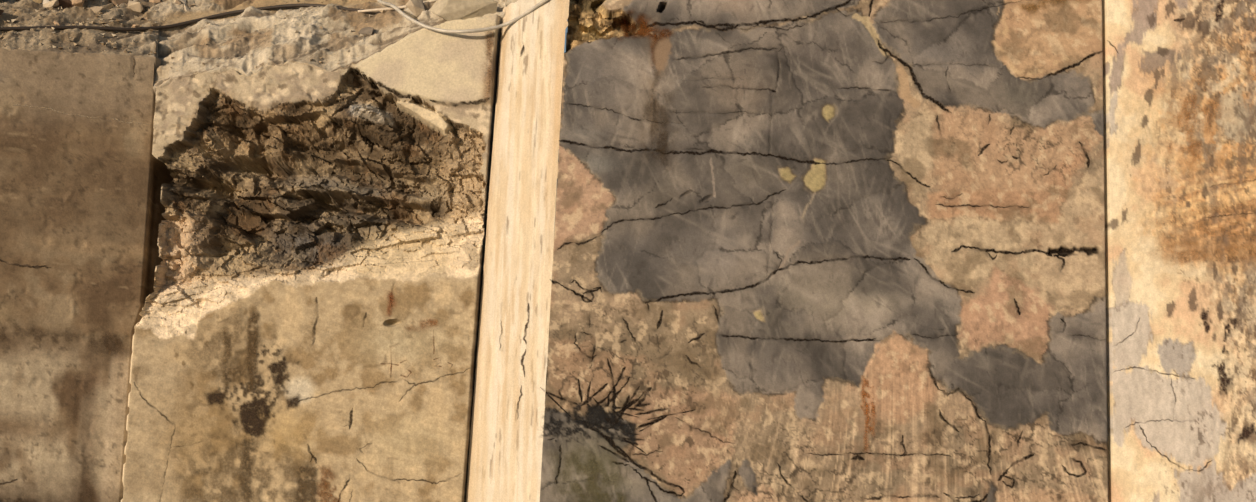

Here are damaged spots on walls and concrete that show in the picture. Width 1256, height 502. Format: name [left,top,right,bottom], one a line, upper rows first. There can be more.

spalling [565,0,667,53]
crack [647,0,950,127]
crack [1020,42,1118,80]
spalling [134,65,490,341]
crack [557,104,1029,250]
water stain [207,313,299,502]
crack [499,245,1096,502]
crack [1062,335,1193,477]
water stain [295,467,316,502]